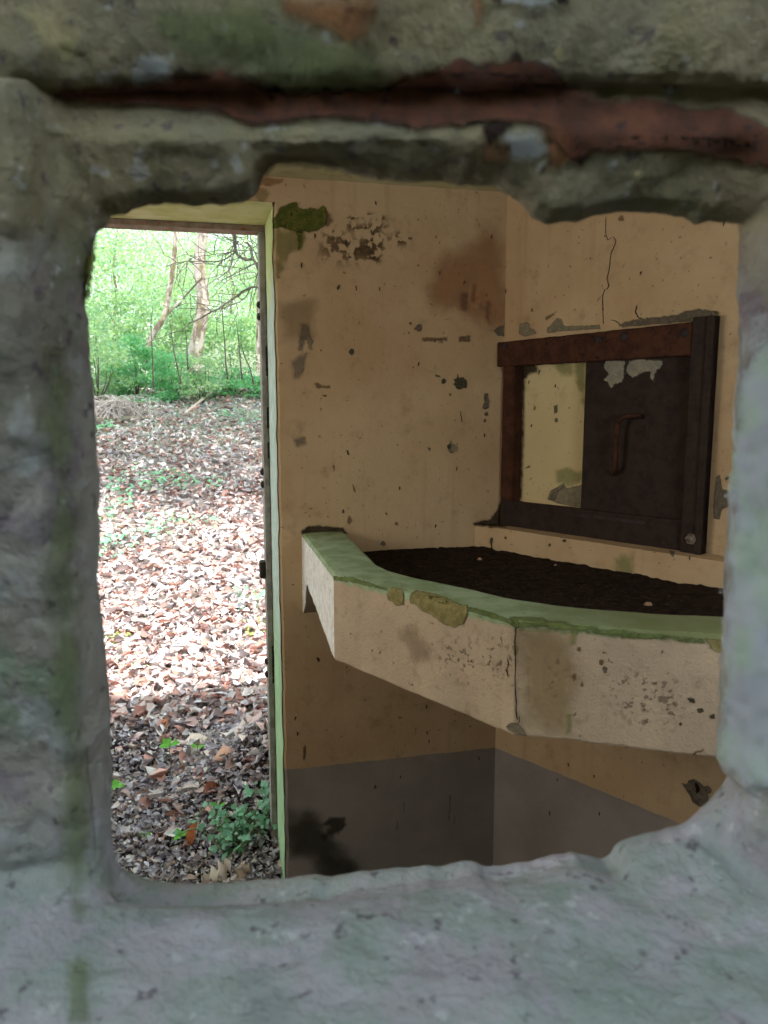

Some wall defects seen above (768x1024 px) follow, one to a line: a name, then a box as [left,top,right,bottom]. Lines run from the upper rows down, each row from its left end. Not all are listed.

crack [598,223,641,327]
spalling [519,309,600,336]
spalling [620,309,719,327]
spalling [387,587,468,628]
crack [500,627,520,723]
hole [682,779,711,807]